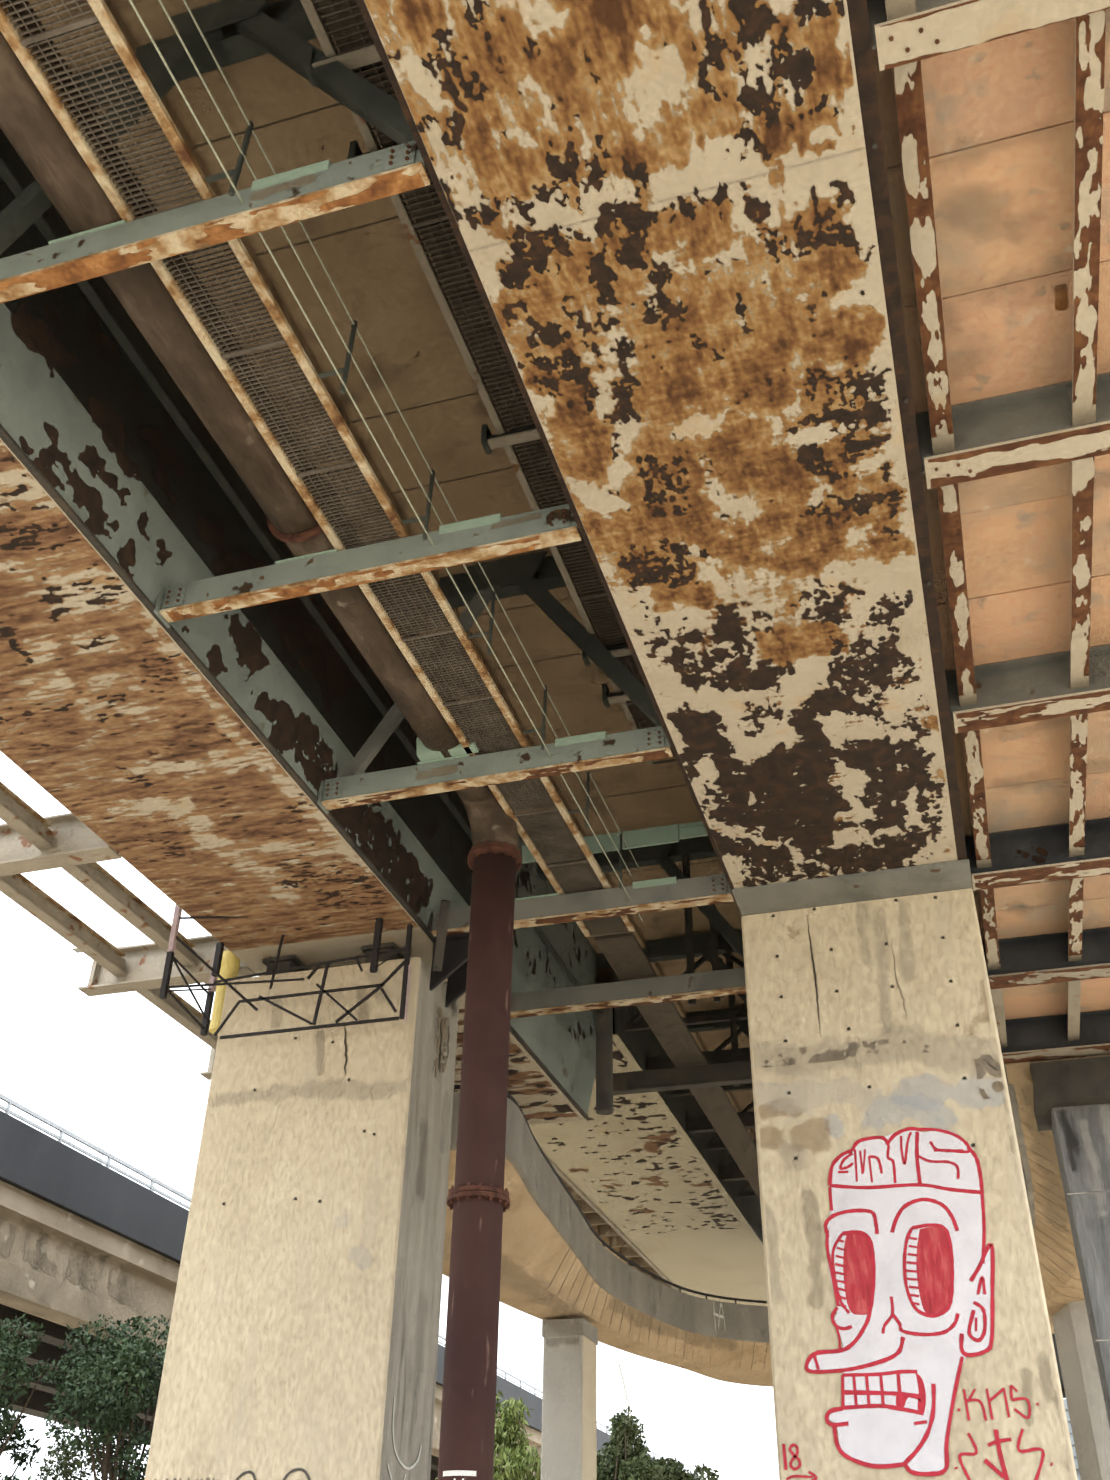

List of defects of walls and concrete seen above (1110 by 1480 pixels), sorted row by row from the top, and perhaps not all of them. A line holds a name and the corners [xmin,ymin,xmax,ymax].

corrosion [0,0,922,728]
peeling [0,393,172,622]
peeling [212,546,268,576]
peeling [0,641,248,772]
corrosion [0,441,540,951]
peeling [206,595,434,939]
corrosion [520,750,669,780]
peeling [618,538,946,887]
crack [807,915,821,1035]
corrosion [508,1038,578,1119]
corrosion [629,1132,675,1153]
spalling [762,1039,906,1067]